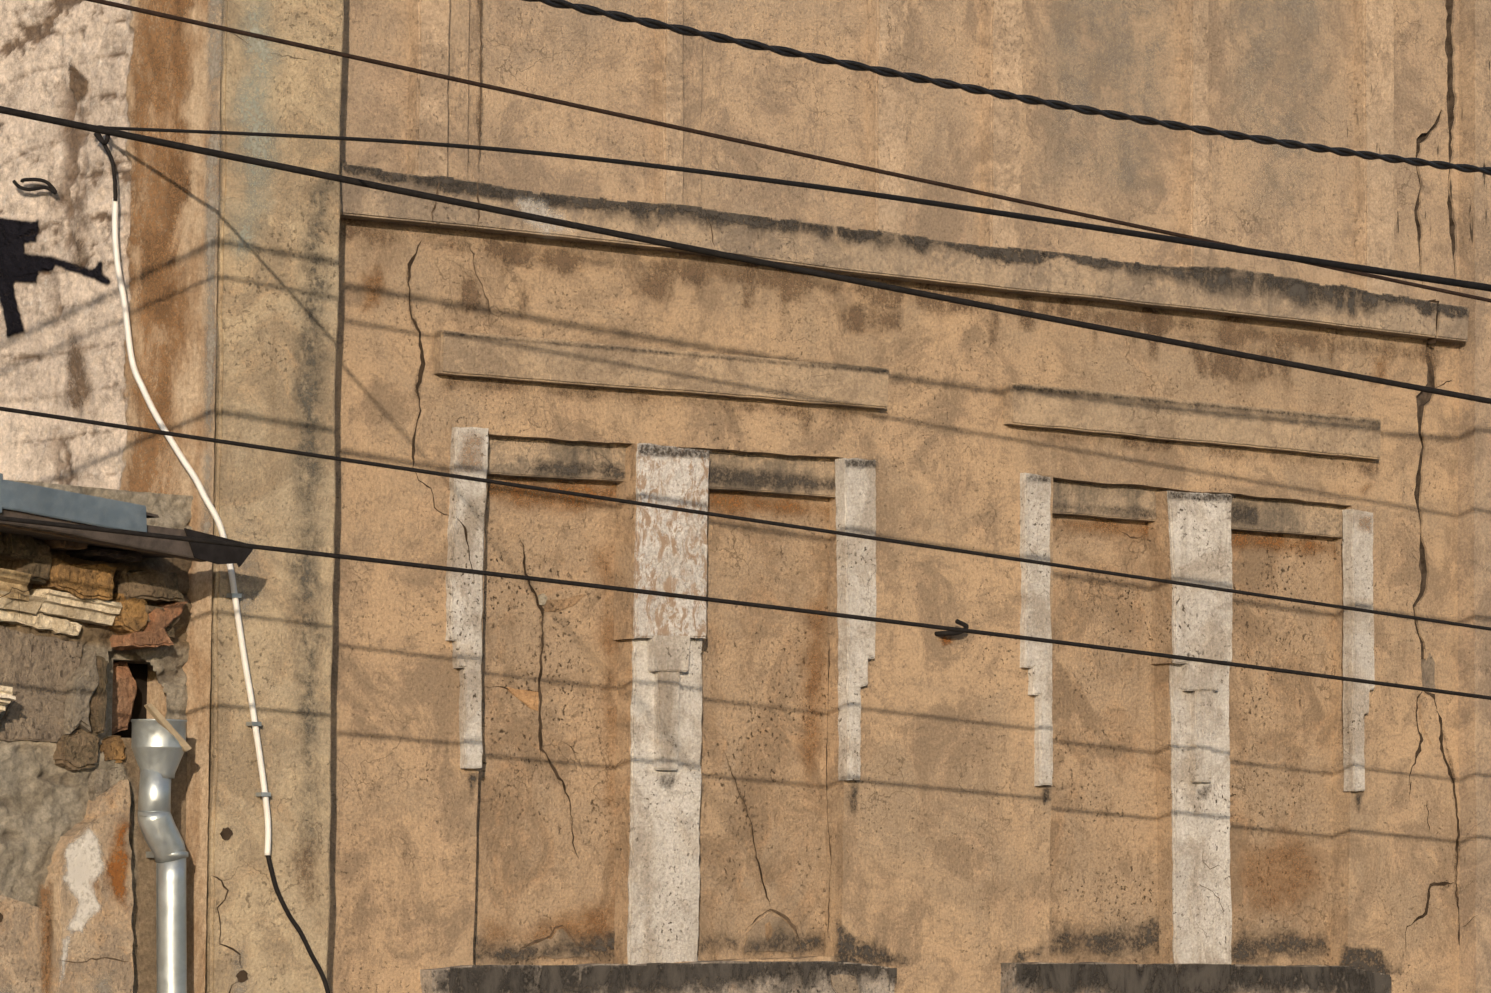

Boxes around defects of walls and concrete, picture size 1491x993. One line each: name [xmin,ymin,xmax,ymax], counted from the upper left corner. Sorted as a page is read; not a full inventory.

crack [407,183,475,581]
crack [469,0,489,322]
damp [484,238,583,273]
damp [523,200,562,231]
damp [638,259,837,307]
damp [843,283,996,342]
damp [1018,298,1334,379]
crack [1405,0,1477,945]
crack [484,540,579,858]
crack [724,752,770,903]
peeling [62,830,103,974]